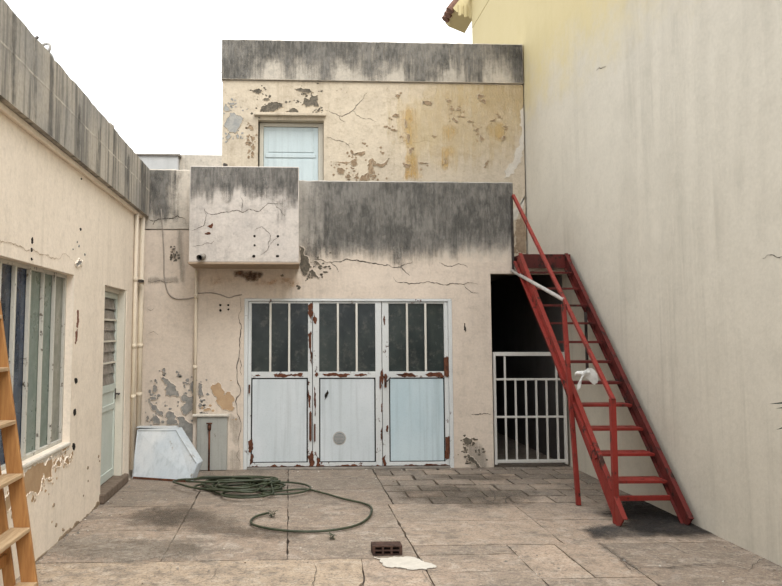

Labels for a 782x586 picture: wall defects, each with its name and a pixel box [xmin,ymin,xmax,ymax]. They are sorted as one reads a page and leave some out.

damp [222,40,523,83]
damp [0,39,176,220]
peeling [222,83,323,159]
damp [190,167,298,204]
peeling [331,142,390,181]
crack [149,196,285,255]
damp [314,181,513,262]
spalling [296,246,331,290]
crack [311,259,476,293]
peeling [145,367,237,443]
peeling [23,443,76,507]
corrosion [248,439,324,467]